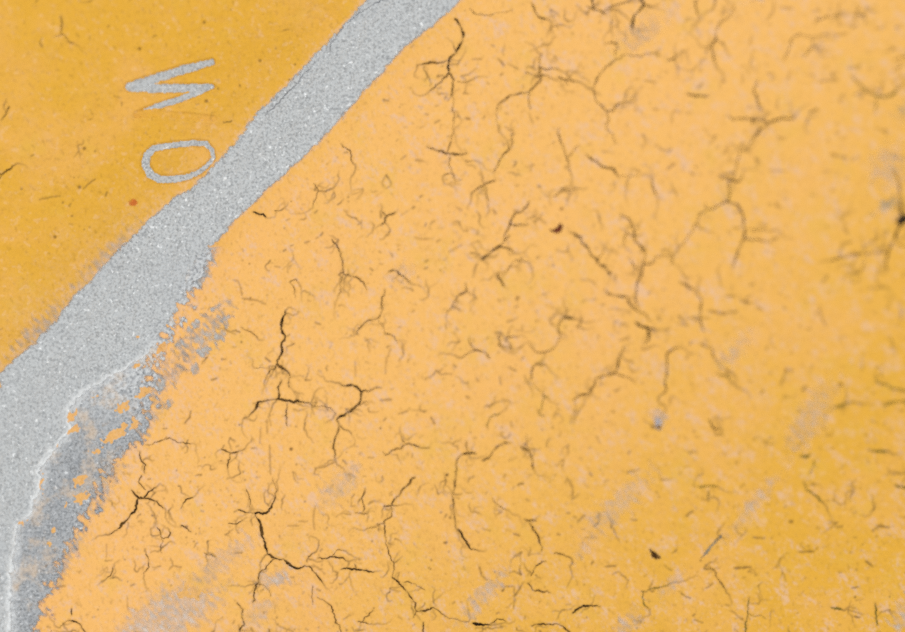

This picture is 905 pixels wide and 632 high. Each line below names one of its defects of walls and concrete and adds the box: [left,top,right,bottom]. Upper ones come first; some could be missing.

crack [422,0,677,203]
peeling [0,0,459,632]
crack [251,279,378,453]
crack [332,240,410,341]
crack [482,202,529,286]
crack [570,83,793,405]
crack [830,167,905,268]
crack [111,438,193,574]
crack [228,477,505,632]
crack [446,413,534,550]
crack [524,519,570,593]
crack [535,605,600,632]